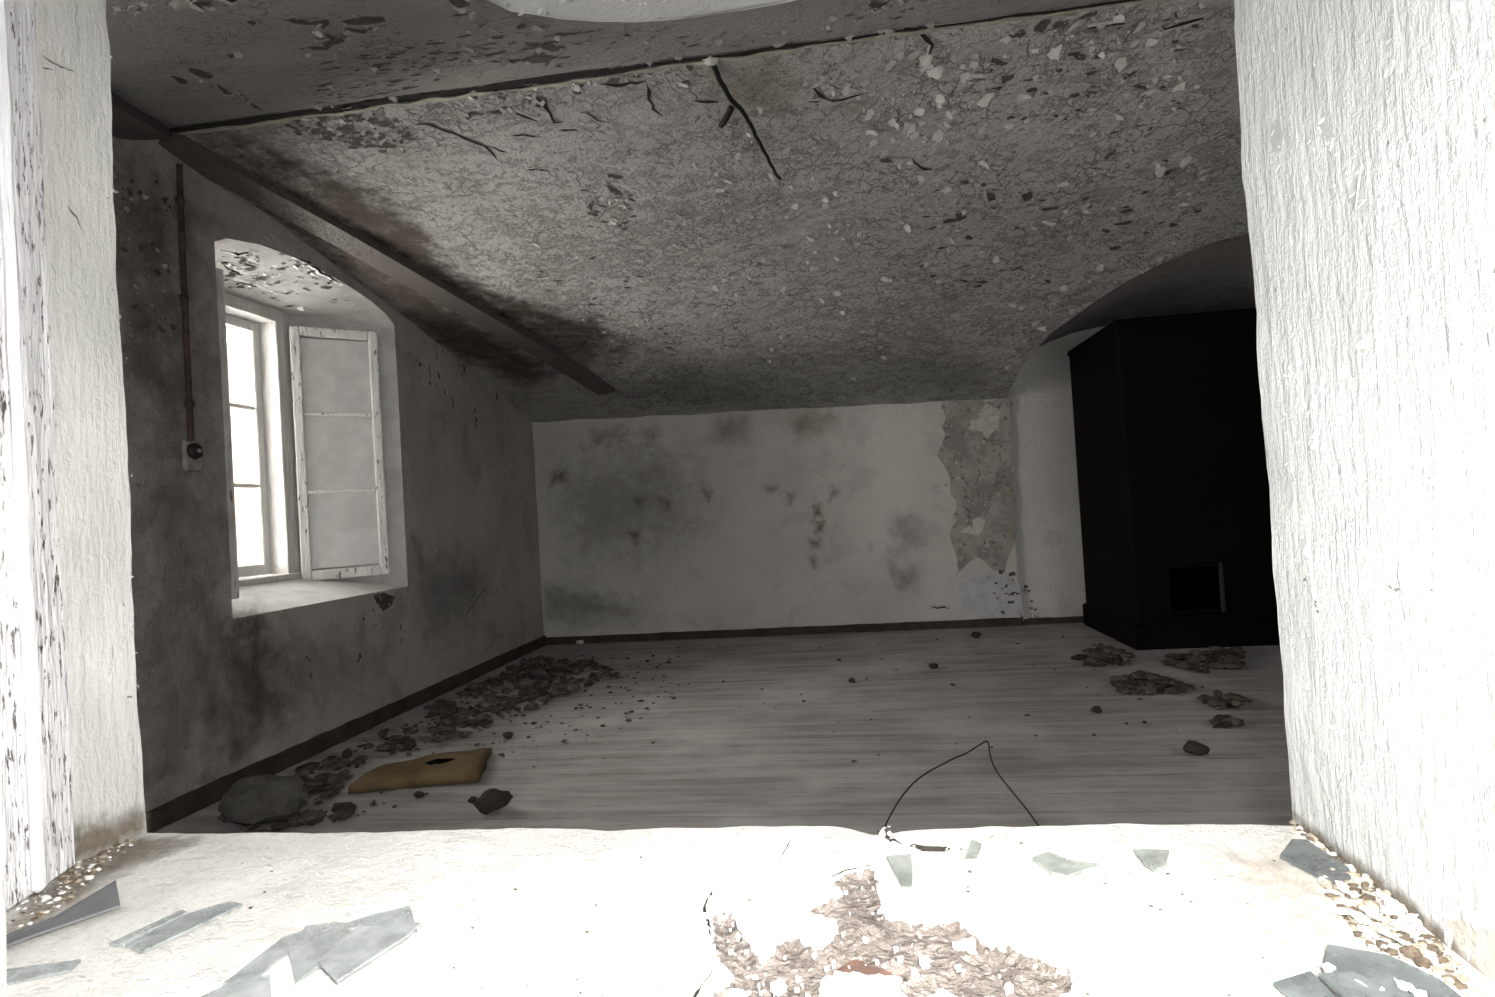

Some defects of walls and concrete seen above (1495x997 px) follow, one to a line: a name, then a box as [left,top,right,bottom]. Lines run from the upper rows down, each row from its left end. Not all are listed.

peeling [112,0,262,26]
peeling [164,68,264,111]
peeling [282,0,915,153]
crack [168,0,1203,171]
peeling [1306,97,1392,248]
damp [234,146,624,384]
peeling [937,398,1043,621]
flaking render [702,863,1073,997]